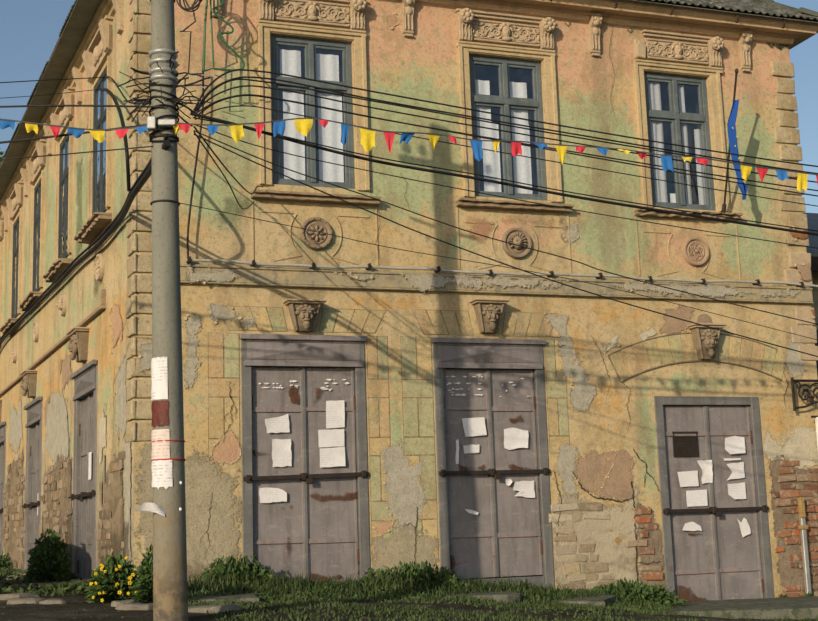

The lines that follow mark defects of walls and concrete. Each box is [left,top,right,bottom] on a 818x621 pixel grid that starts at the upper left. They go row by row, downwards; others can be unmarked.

flaking render [187,266,240,286]
flaking render [400,272,569,293]
flaking render [44,353,72,465]
flaking render [99,354,153,565]
flaking render [185,429,242,581]
crack [223,381,237,443]
rust [288,386,300,404]
rust [310,492,358,501]
flaking render [371,438,440,582]
crack [554,336,662,582]
flaking render [553,443,666,595]
flaking render [763,425,818,597]